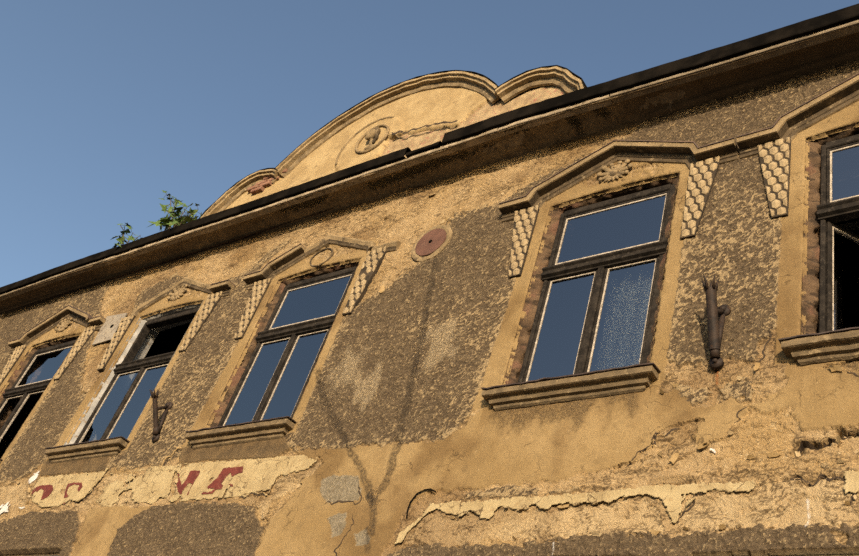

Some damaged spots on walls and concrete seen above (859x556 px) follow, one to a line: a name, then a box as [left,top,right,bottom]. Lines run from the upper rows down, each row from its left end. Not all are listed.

crack [798,431,859,454]
peeling [0,455,324,523]
crack [326,483,362,556]
flaking render [394,417,859,548]
crack [783,474,857,505]